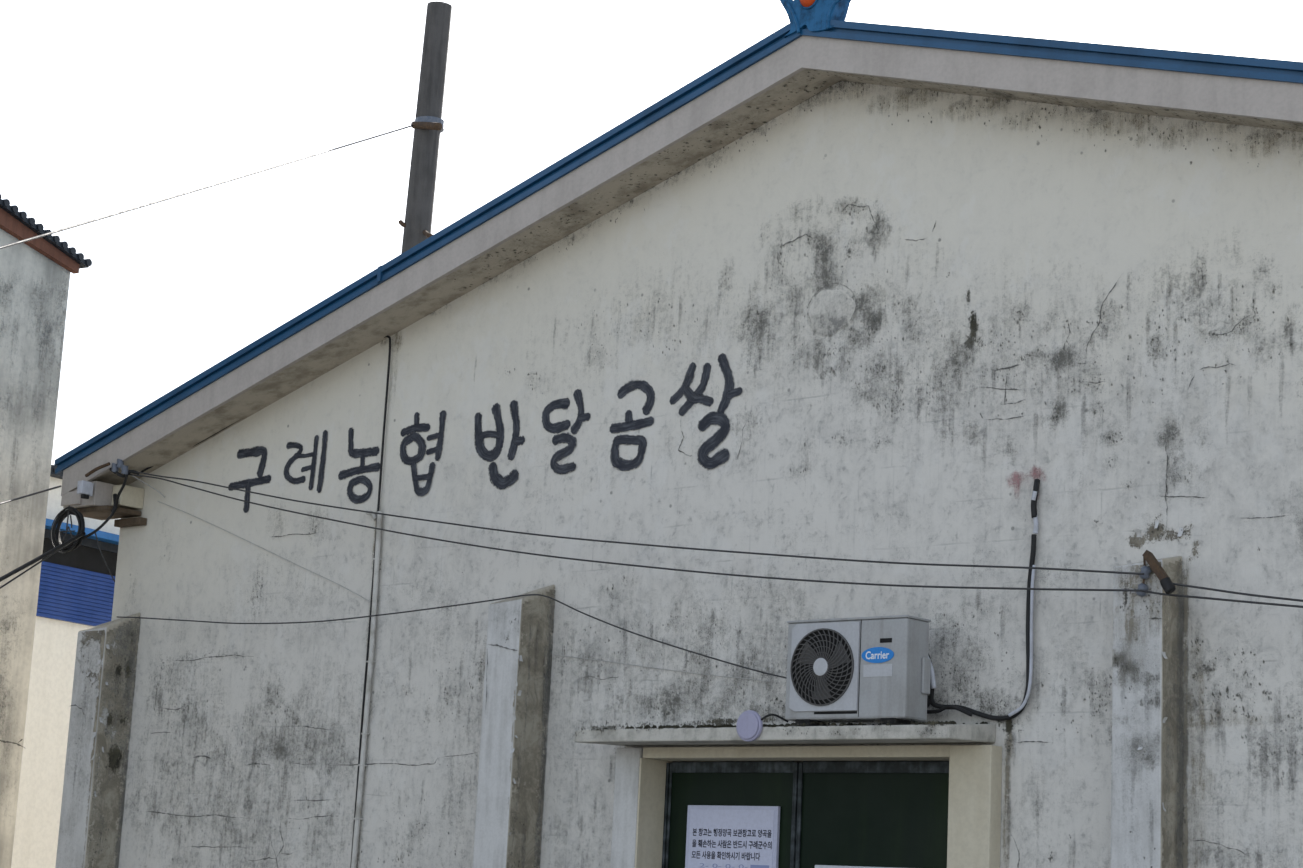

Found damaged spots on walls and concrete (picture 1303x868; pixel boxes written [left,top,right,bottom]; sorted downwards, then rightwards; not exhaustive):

damp [553,70,1303,249]
damp [780,202,890,294]
damp [735,289,770,350]
damp [813,291,884,374]